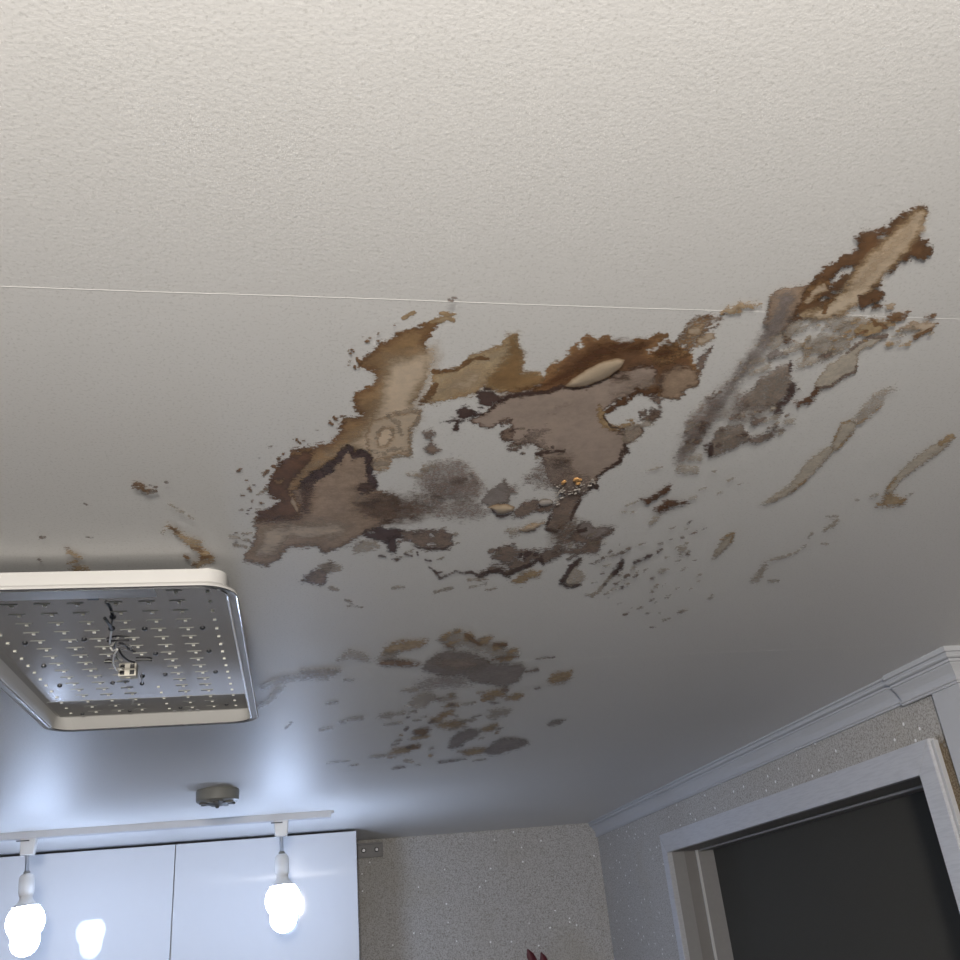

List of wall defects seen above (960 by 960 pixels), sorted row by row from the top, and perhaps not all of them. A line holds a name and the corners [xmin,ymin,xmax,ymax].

water stain [231,205,939,613]
spalling [553,472,597,505]
water stain [859,433,956,509]
water stain [162,524,215,569]
water stain [258,628,556,769]
water stain [534,670,572,690]